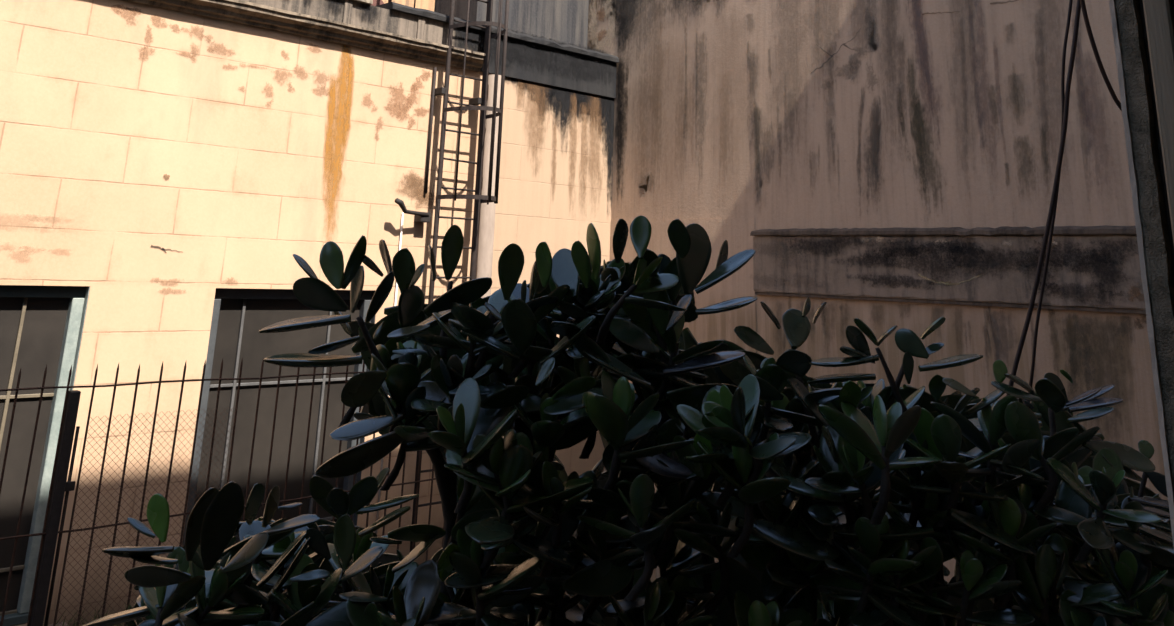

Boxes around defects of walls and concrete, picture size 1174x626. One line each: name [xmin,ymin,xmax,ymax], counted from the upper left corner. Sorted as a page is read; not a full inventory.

corrosion [325,45,354,229]
spalling [386,72,430,127]
water stain [454,0,660,199]
water stain [857,95,880,186]
water stain [898,0,941,196]
water stain [790,236,1131,416]